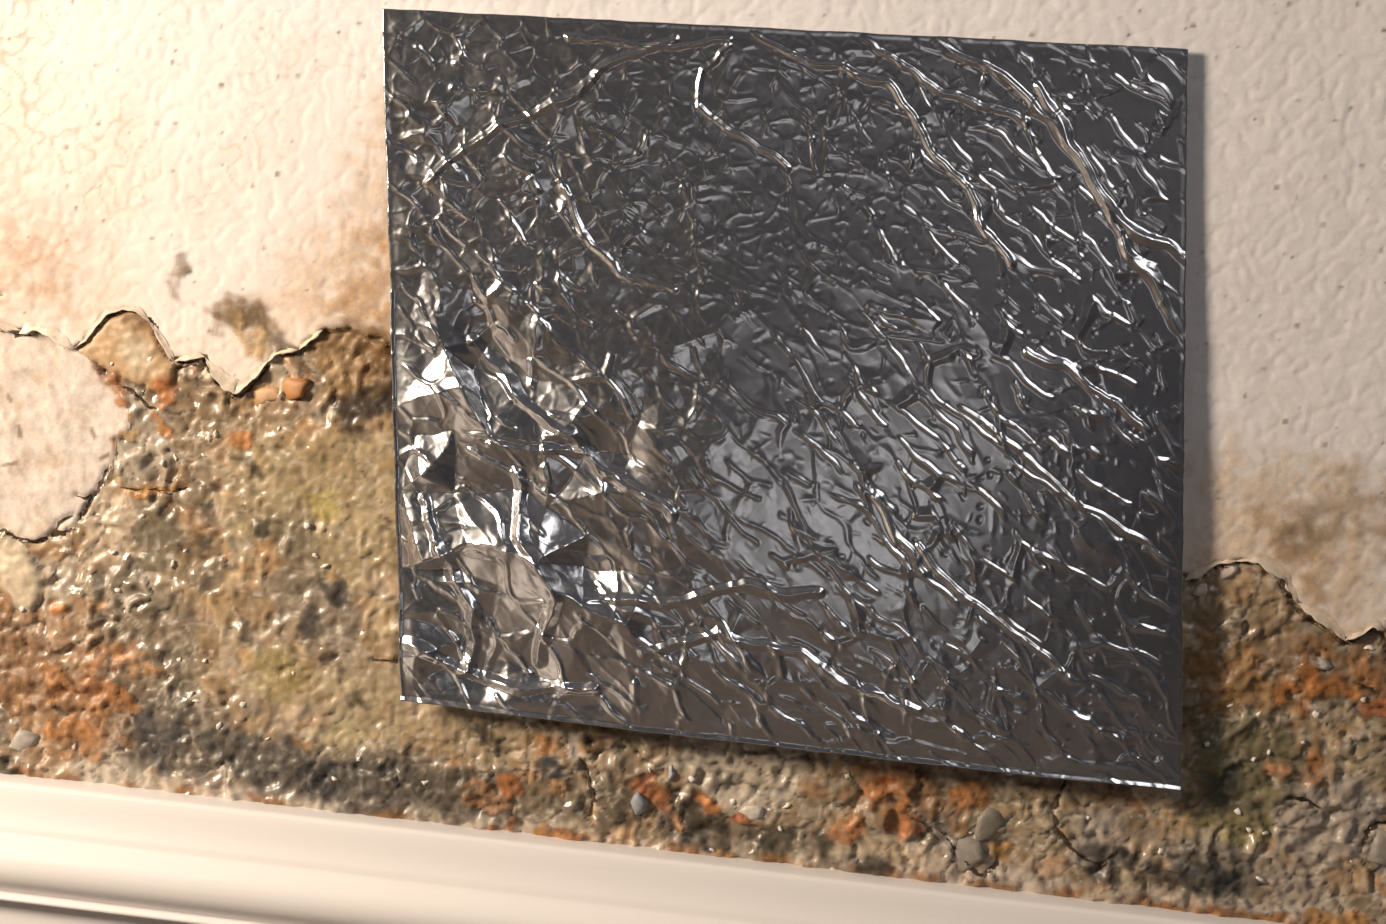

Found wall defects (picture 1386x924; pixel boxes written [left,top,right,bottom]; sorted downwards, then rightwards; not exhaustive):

crack [0,329,65,349]
leakage [213,293,392,440]
leakage [254,519,267,537]
leakage [1226,481,1376,615]
leakage [297,580,347,638]
spalling [0,305,1386,924]
leakage [0,757,21,775]
leakage [130,710,500,824]
leakage [537,755,561,781]
leakage [663,803,725,849]
leakage [856,856,894,876]
leakage [1079,843,1241,894]